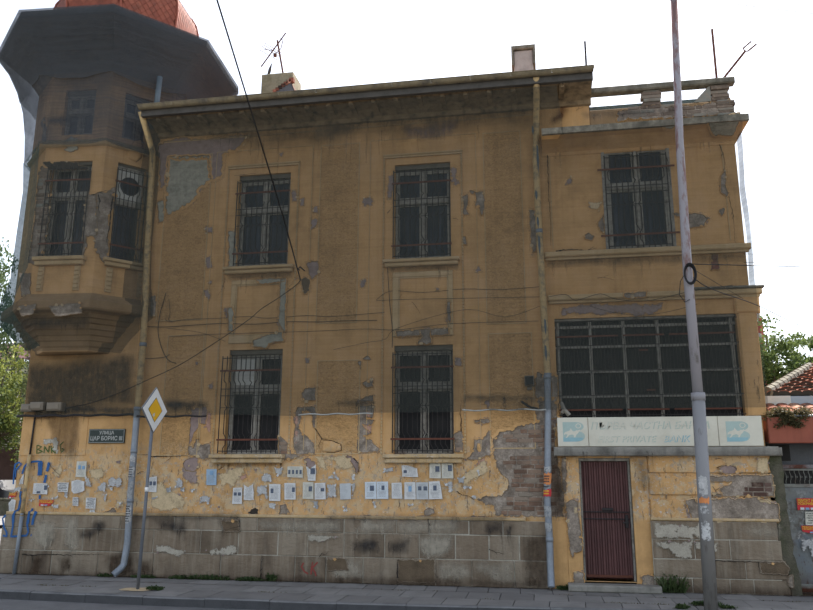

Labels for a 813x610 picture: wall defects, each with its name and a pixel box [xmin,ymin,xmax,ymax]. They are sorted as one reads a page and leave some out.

flaking render [17,146,88,317]
flaking render [81,187,118,262]
flaking render [142,133,251,223]
flaking render [461,190,486,216]
damp [27,357,131,415]
flaking render [277,378,380,474]
peeling [151,482,186,513]
flaking render [453,371,584,558]
peeling [654,498,700,559]
flaking render [710,457,781,523]